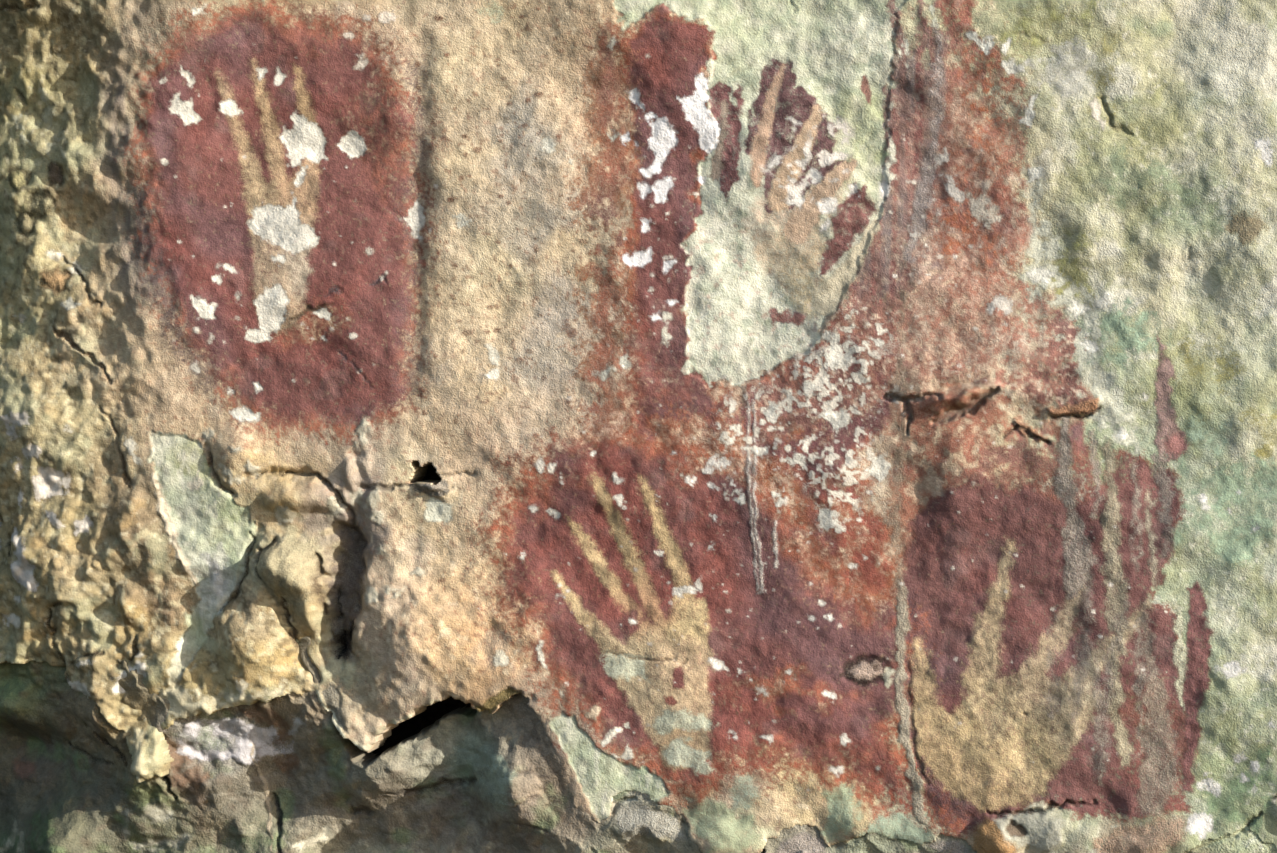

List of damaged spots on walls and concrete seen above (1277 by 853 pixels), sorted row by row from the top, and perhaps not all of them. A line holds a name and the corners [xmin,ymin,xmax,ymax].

peeling [158,65,203,126]
peeling [246,111,369,267]
peeling [189,294,225,346]
peeling [234,283,290,344]
peeling [606,0,924,563]
peeling [885,146,1141,457]
water stain [555,0,1190,825]
water stain [1214,660,1249,680]
water stain [1196,771,1222,799]
water stain [1232,752,1260,794]
water stain [1185,811,1214,840]
crack [1221,794,1277,838]